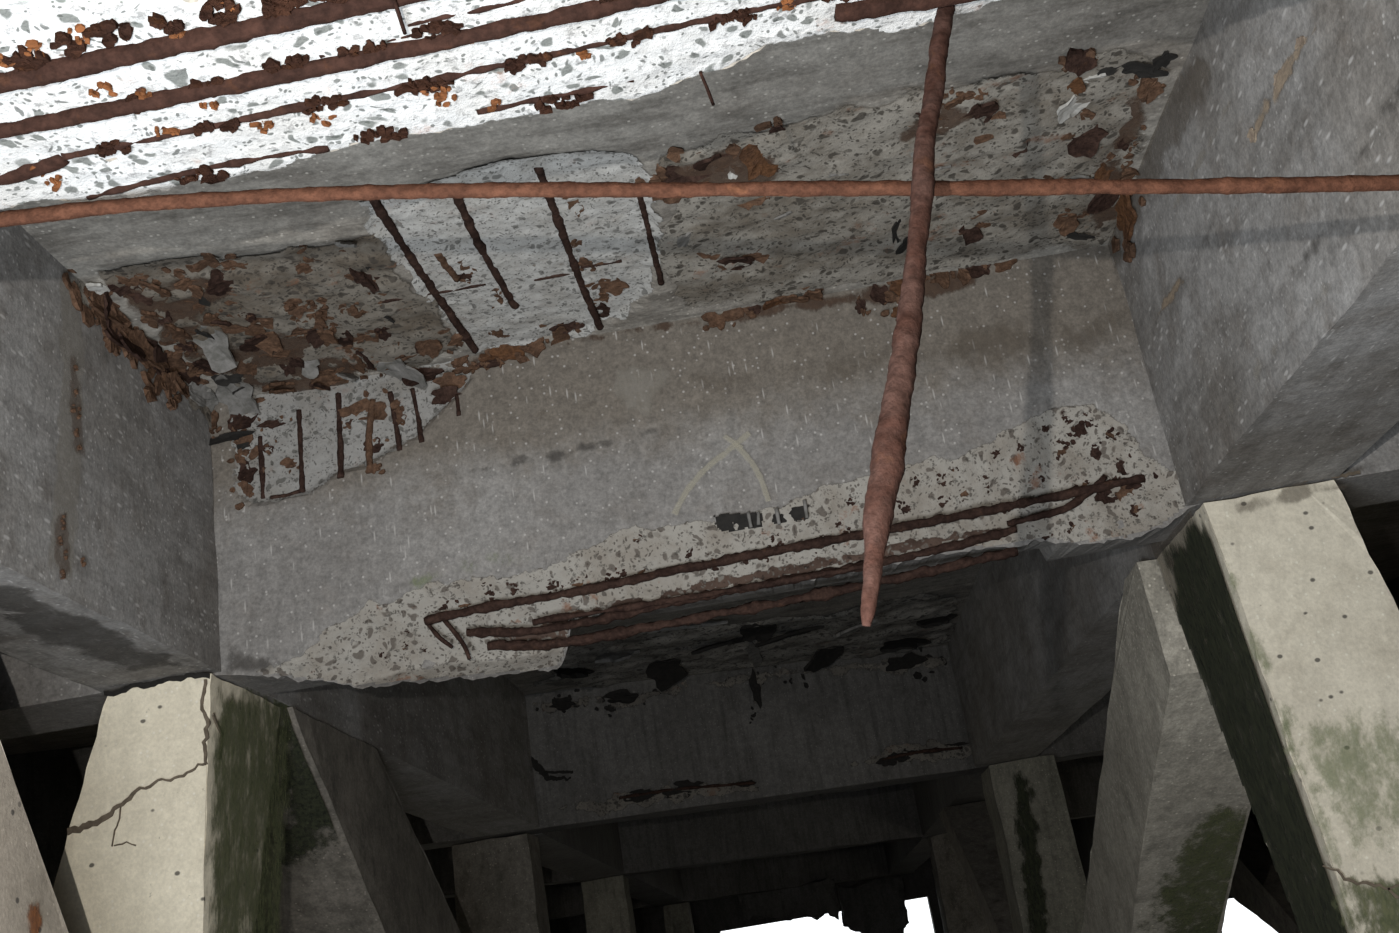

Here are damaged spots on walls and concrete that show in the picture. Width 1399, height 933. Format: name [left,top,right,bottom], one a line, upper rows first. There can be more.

rust [701,279,903,331]
rust [925,259,1017,298]
rust [452,321,604,374]
spalling [0,0,1399,724]
crack [67,672,221,847]